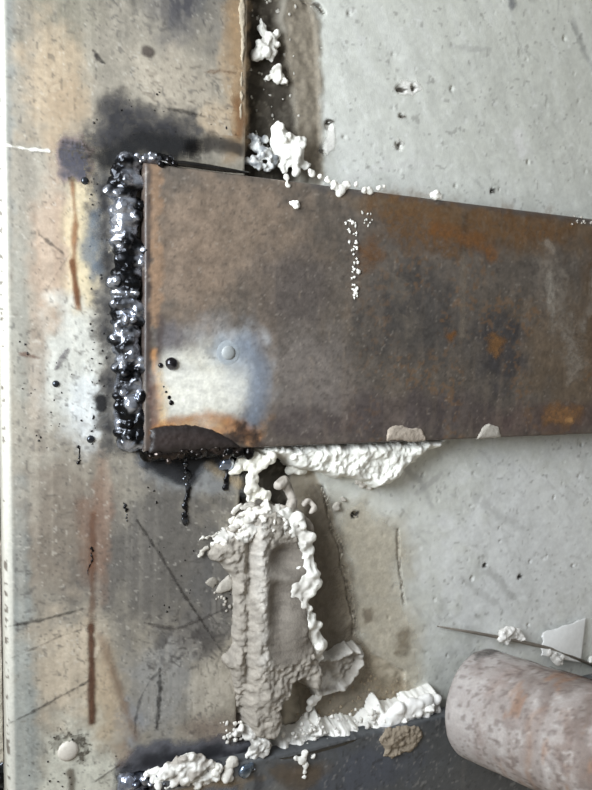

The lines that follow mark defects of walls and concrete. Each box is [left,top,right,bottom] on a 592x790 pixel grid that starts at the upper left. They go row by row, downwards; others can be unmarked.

corrosion [70,216,80,309]